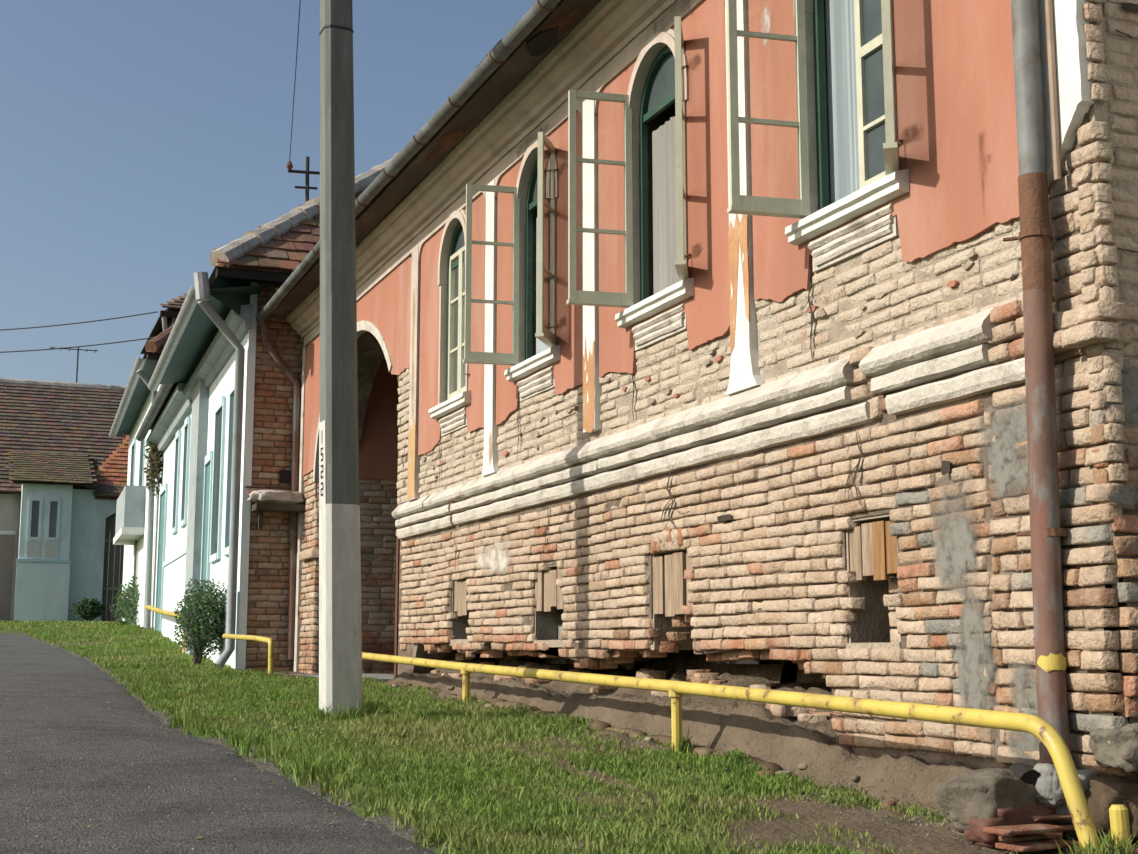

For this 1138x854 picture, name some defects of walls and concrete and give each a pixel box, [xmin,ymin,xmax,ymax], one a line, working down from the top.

flaking render [1049,0,1138,427]
flaking render [359,214,1023,673]
crack [845,430,862,506]